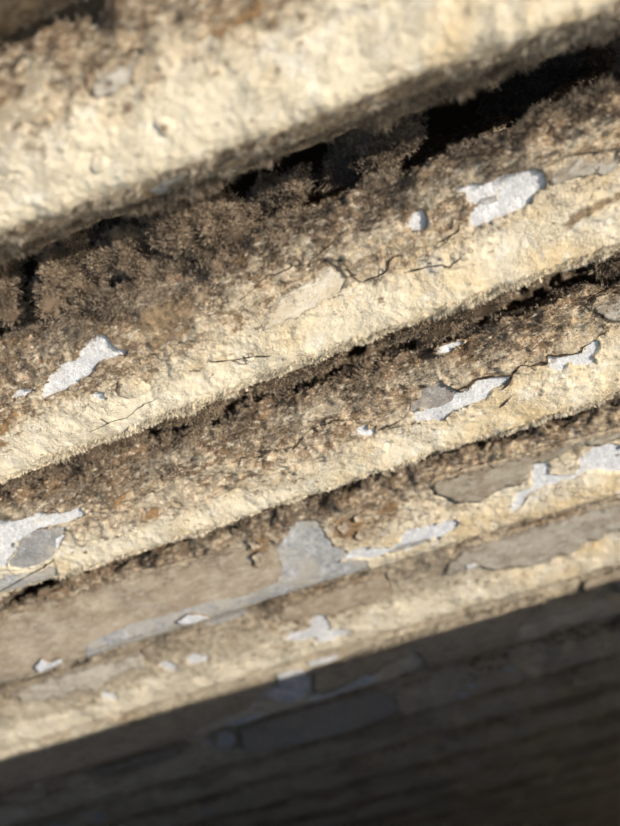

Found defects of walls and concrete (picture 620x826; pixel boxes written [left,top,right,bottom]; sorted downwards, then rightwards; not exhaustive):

peeling [454,169,546,227]
crack [240,207,466,300]
peeling [12,334,127,400]
peeling [547,340,598,371]
peeling [409,377,510,424]
peeling [510,443,620,512]
peeling [0,507,85,568]
peeling [79,519,461,657]